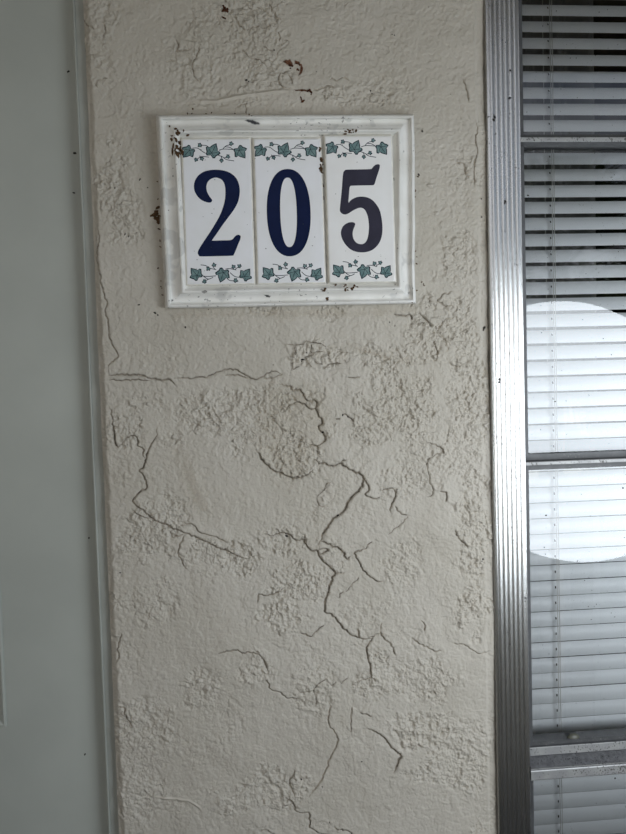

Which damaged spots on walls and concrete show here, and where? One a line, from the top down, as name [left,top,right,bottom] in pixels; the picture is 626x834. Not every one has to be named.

crack [394,291,466,367]
crack [426,443,447,502]
crack [96,233,408,834]
crack [412,621,488,654]